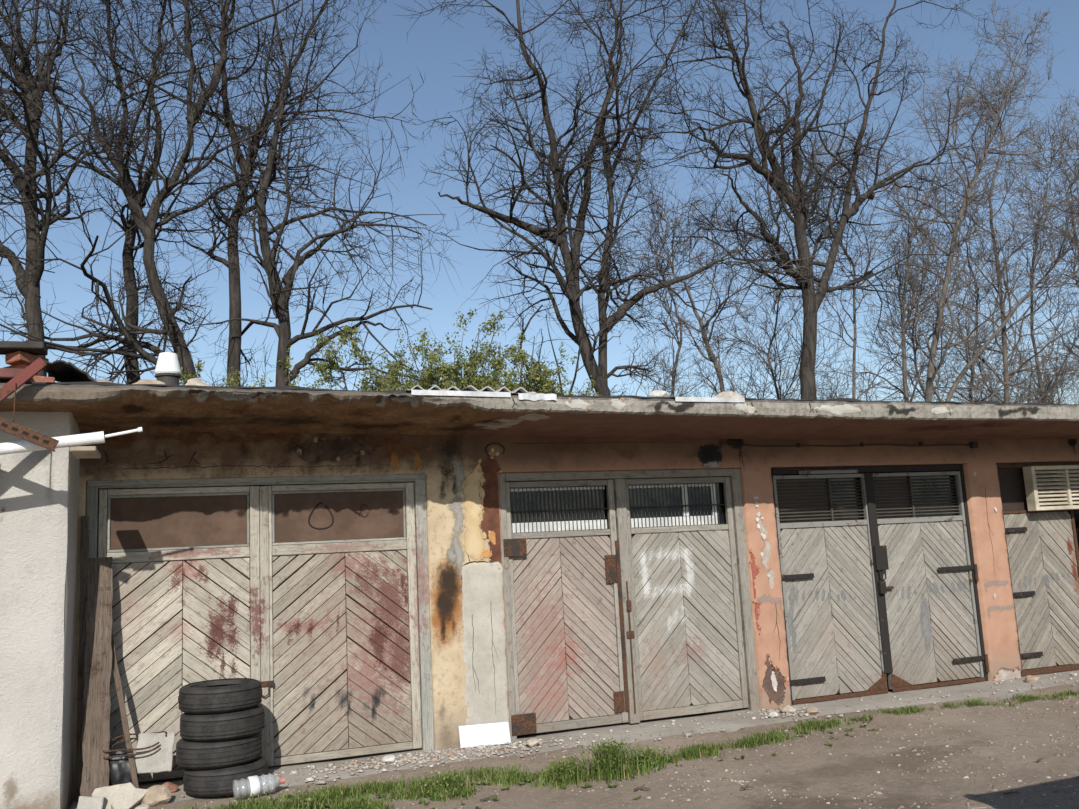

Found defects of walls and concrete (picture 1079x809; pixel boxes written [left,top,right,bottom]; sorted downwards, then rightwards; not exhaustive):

leakage [109,434,135,449]
leakage [123,388,409,461]
leakage [374,393,443,407]
peeling [749,496,774,634]
spalling [761,654,789,707]